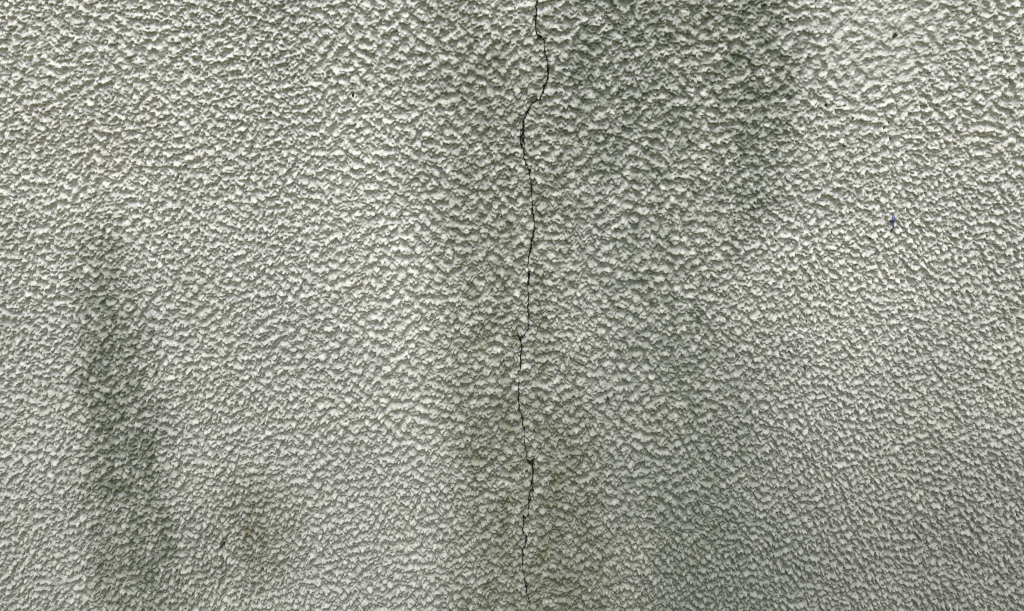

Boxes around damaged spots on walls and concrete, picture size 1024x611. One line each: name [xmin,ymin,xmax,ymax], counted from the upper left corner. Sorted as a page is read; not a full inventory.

crack [518,0,552,604]